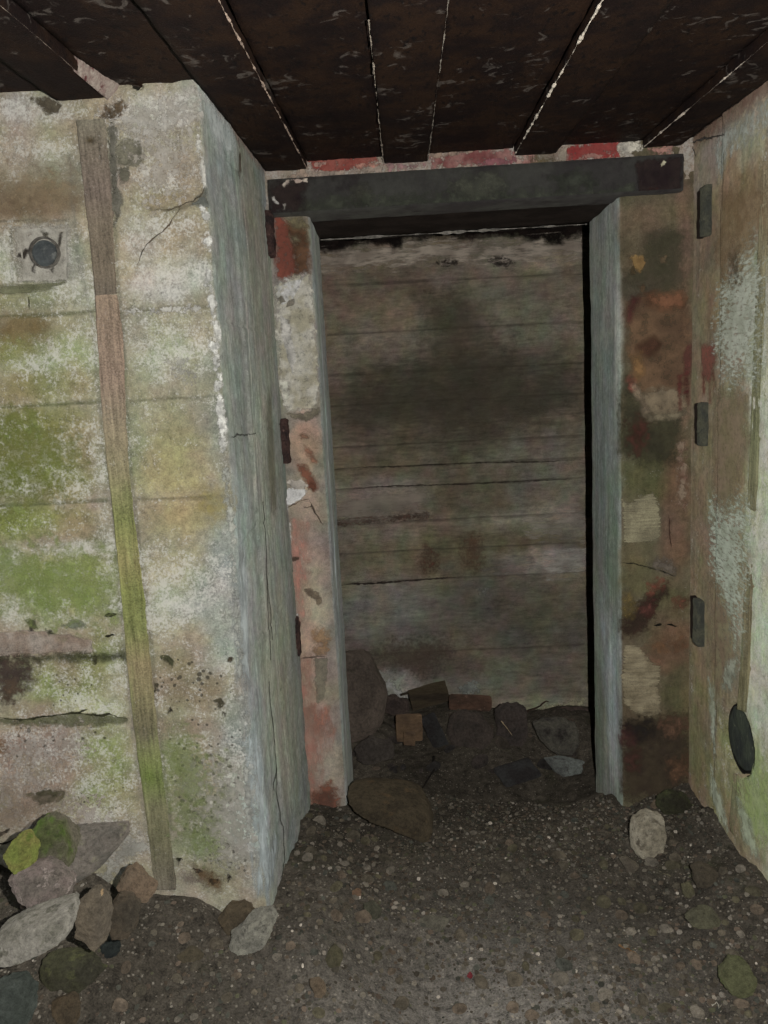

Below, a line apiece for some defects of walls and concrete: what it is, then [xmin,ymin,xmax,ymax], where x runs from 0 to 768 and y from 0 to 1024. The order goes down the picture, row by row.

crack [137,187,205,265]
corrosion [297,434,317,491]
damp [708,187,767,754]
damp [0,656,33,705]
crack [0,709,127,721]
damp [711,769,727,825]
damp [737,799,757,858]